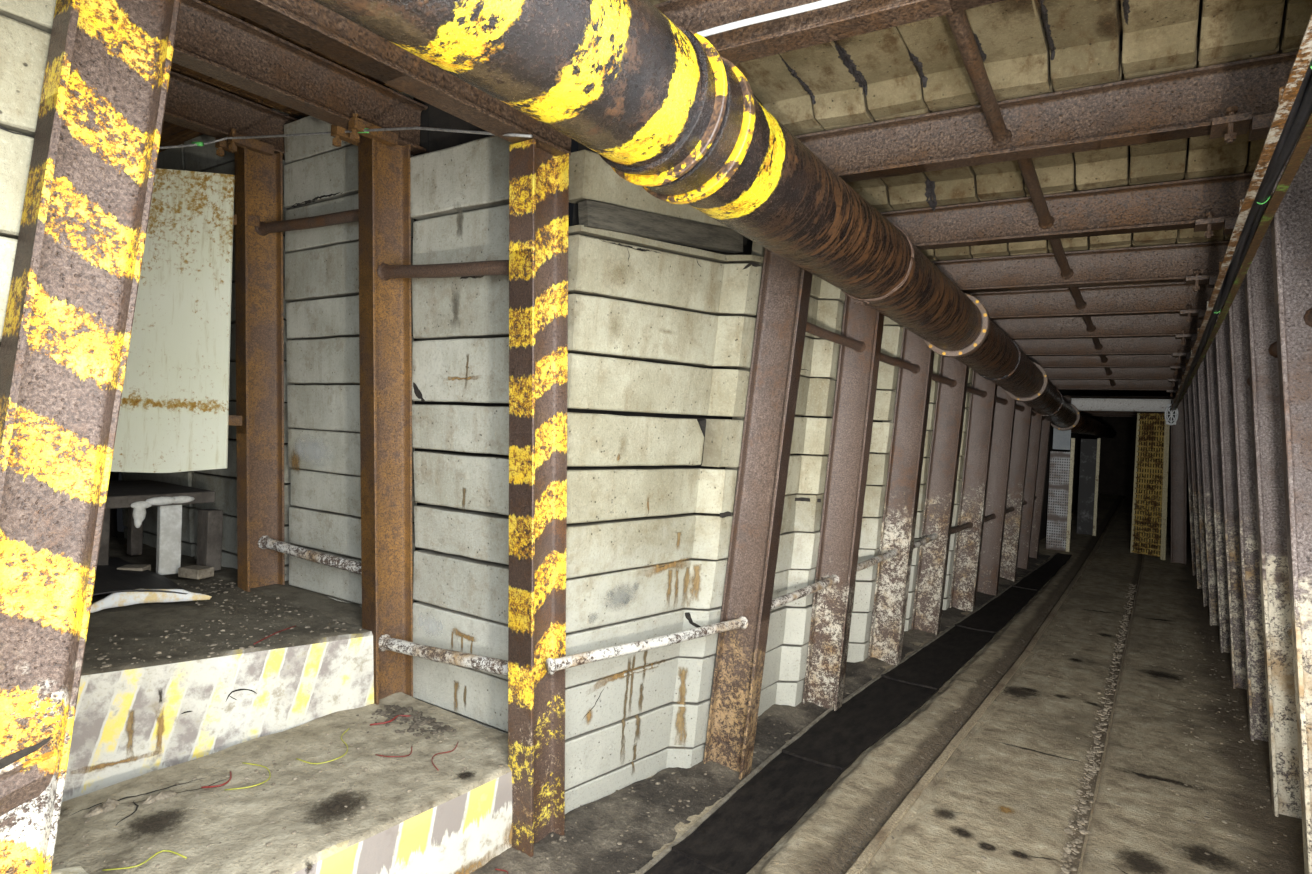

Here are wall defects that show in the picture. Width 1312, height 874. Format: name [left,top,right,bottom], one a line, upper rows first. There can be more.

rust [651,532,700,603]
rust [596,650,663,771]
rust [676,668,687,743]
water stain [1119,851,1164,874]
water stain [1181,845,1232,871]